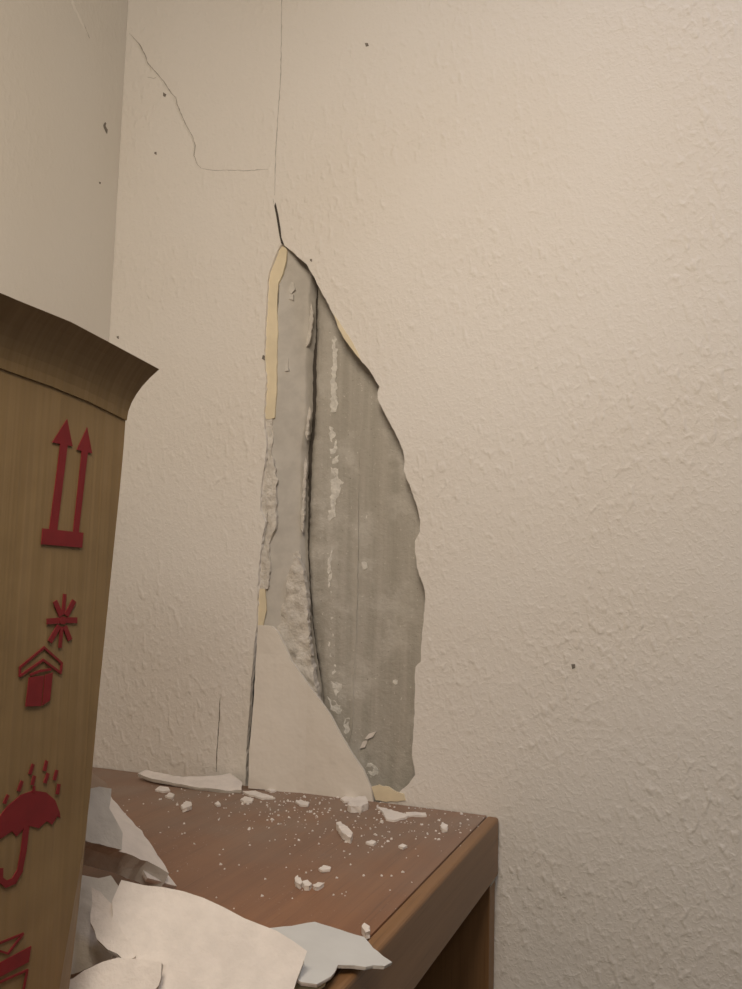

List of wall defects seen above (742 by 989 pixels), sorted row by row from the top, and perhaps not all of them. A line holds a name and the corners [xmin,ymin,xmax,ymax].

crack [128,0,284,245]
flaking render [258,246,427,822]
flaking render [336,821,353,844]